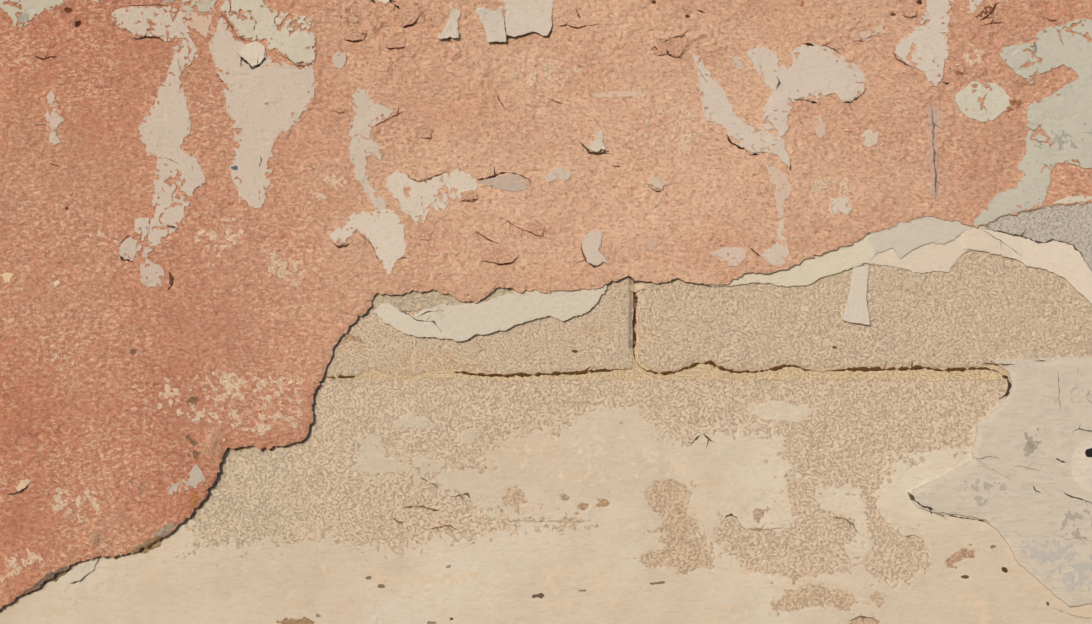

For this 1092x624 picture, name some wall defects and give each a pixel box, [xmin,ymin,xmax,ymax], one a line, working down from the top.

peeling [476,0,554,42]
peeling [111,0,317,287]
peeling [329,87,530,275]
peeling [693,44,866,267]
peeling [973,18,1092,270]
crack [432,290,1060,405]
crack [511,513,586,523]
peeling [168,251,1092,624]
crack [725,513,788,530]
crack [831,516,857,533]
crack [903,492,990,538]
crack [975,456,1091,503]